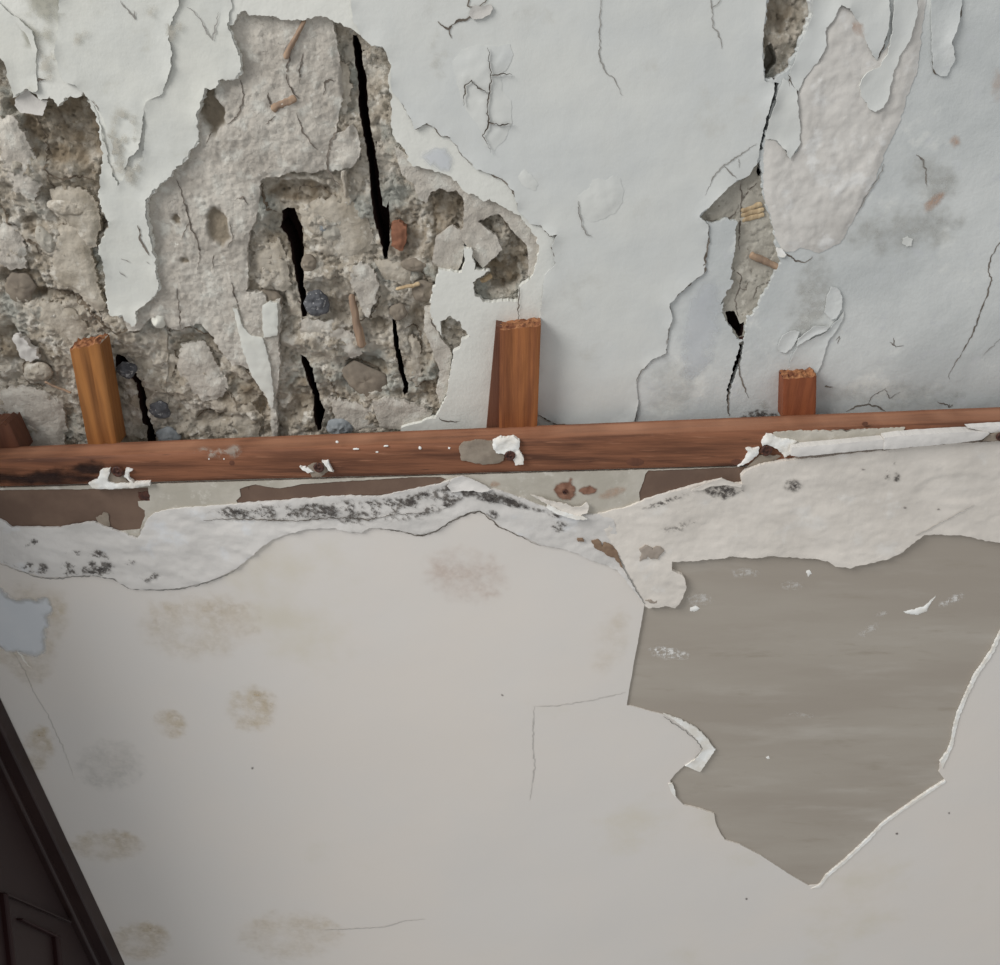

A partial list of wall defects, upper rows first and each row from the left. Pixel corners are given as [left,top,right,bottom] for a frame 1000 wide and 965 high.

crack [438,0,487,37]
crack [402,48,515,197]
peeling [0,0,962,446]
crack [280,207,307,316]
crack [301,355,325,430]
crack [392,319,409,394]
crack [726,336,748,415]
damp [222,485,566,532]
rust [554,479,597,500]
damp [705,485,738,499]
damp [65,551,111,576]
peeling [627,534,1000,889]